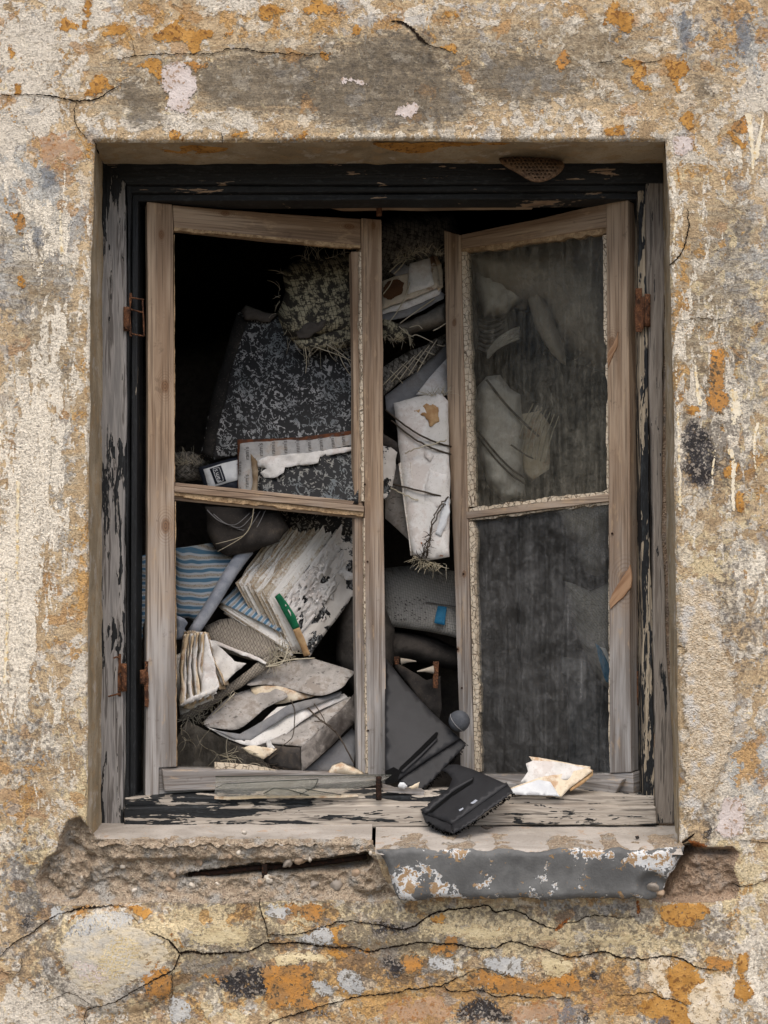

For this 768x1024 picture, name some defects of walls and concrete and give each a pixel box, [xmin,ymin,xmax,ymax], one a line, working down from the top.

crack [391,20,457,55]
crack [0,85,120,138]
crack [670,209,690,265]
spalling [35,816,396,1024]
crack [0,898,718,1024]
spalling [647,797,747,928]